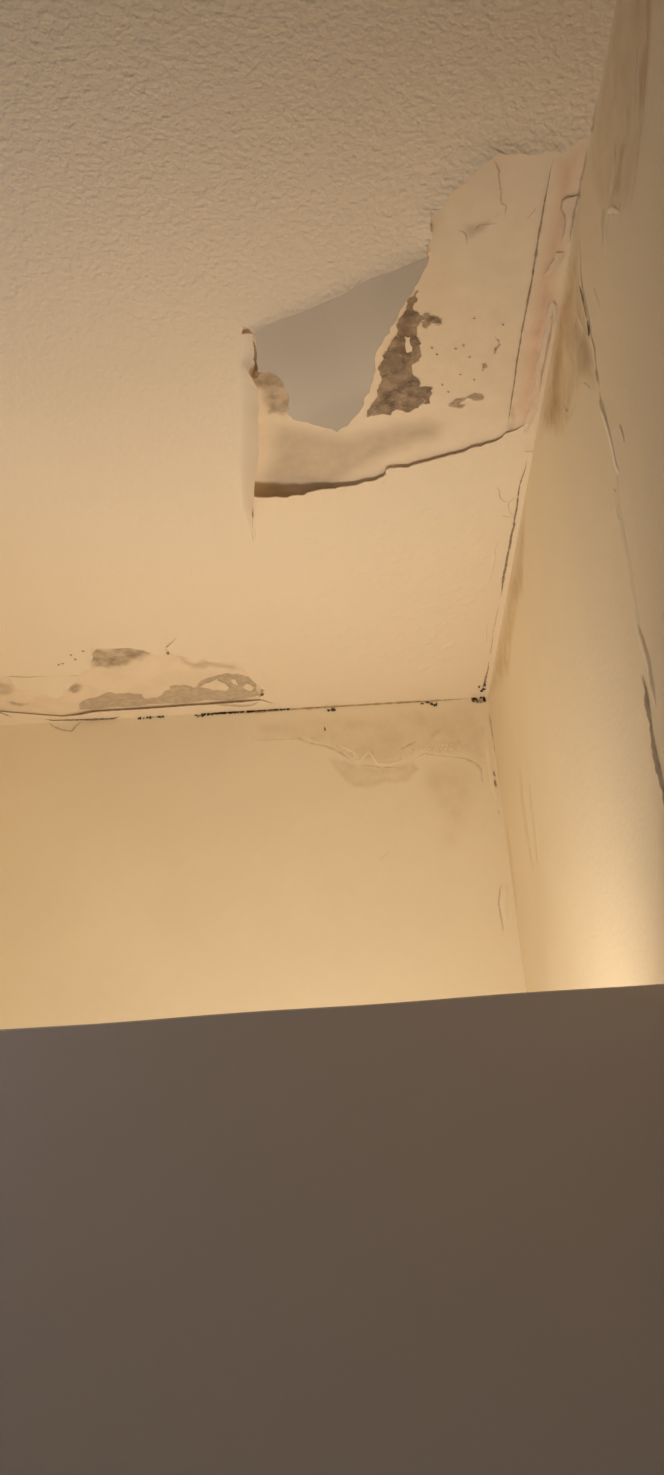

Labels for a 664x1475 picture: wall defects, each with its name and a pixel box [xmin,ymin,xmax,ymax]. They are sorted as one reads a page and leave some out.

peeling [238,104,625,544]